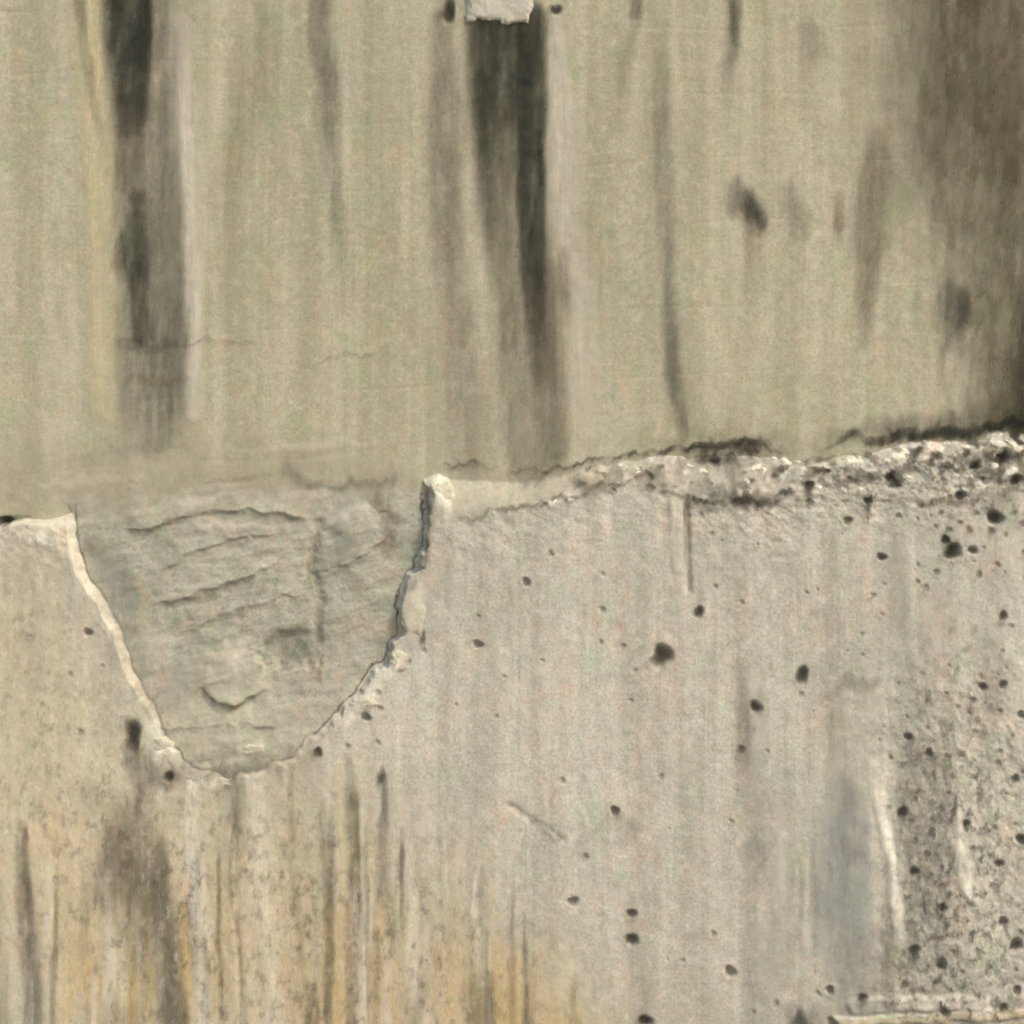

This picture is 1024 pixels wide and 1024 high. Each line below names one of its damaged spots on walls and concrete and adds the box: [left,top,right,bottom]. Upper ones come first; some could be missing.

damp [84,0,200,428]
damp [473,6,571,332]
damp [734,181,764,223]
peeling [881,448,909,478]
peeling [928,433,1024,536]
spalling [23,477,455,793]
damp [19,849,65,1024]
damp [109,780,208,1024]
damp [338,783,361,908]
damp [380,774,388,841]